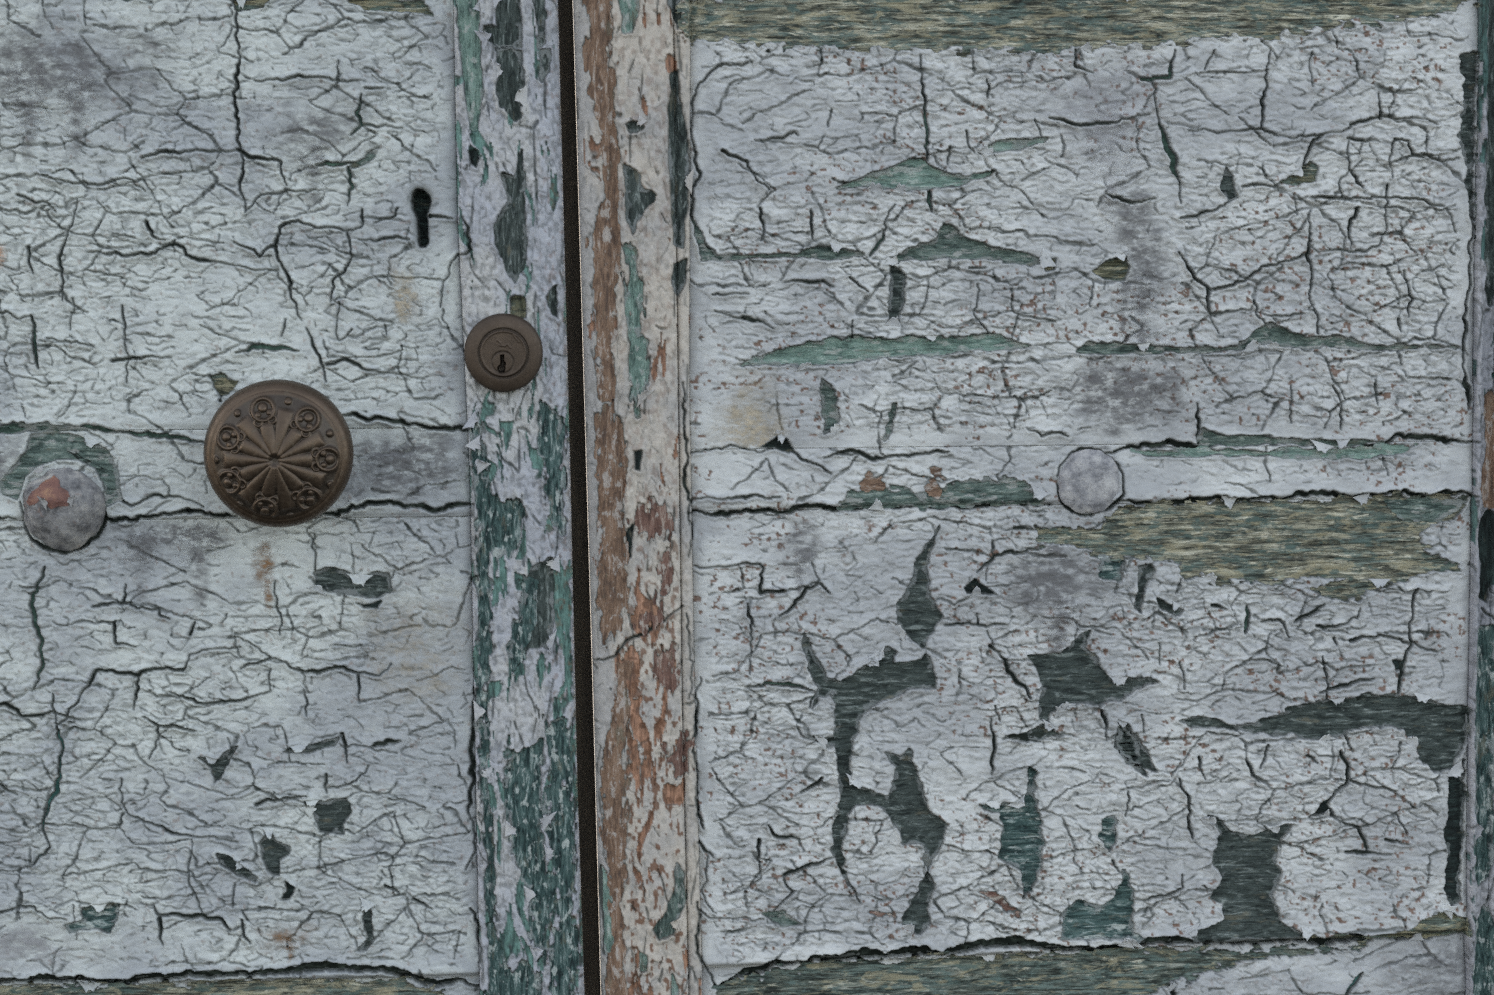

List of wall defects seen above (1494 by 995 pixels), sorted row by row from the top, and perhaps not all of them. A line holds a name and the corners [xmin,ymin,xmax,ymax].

rust [26,465,76,511]
crack [0,451,164,854]
crack [89,595,241,727]
crack [247,337,366,370]
crack [468,701,478,837]
peeling [462,400,579,995]
peeling [582,0,864,696]
peeling [802,527,947,936]
peeling [668,0,1494,305]
peeling [712,625,1494,995]
peeling [1034,387,1494,615]
crack [1188,111,1390,315]